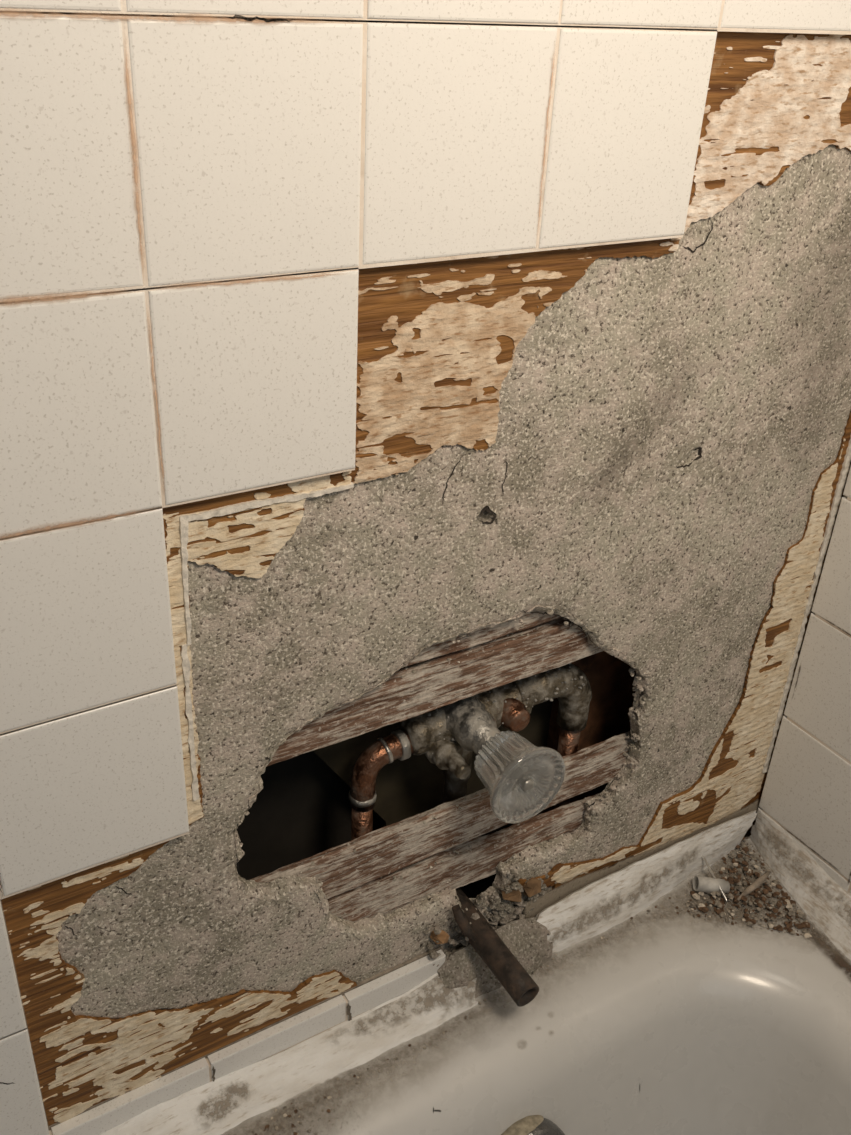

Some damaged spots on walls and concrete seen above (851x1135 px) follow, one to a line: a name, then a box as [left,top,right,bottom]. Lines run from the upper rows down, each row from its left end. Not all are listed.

flaking render [684,34,851,232]
spalling [17,145,851,1018]
flaking render [40,1008,214,1123]
flaking render [199,972,354,1036]